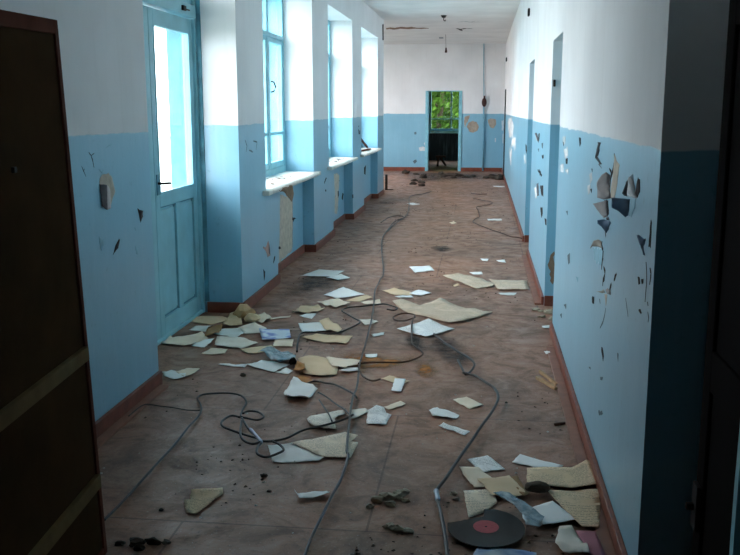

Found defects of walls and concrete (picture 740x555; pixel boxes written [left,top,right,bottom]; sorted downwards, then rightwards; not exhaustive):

flaking render [464,115,479,133]
peeling [99,173,115,210]
peeling [587,142,640,233]
peeling [263,176,297,263]
peeling [637,221,652,255]